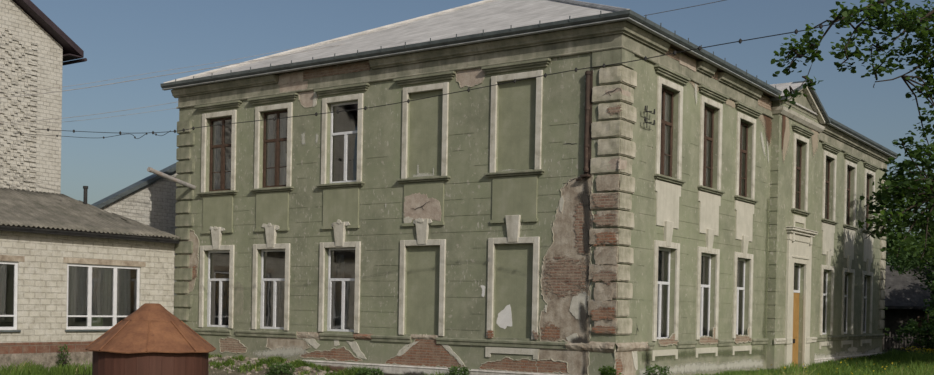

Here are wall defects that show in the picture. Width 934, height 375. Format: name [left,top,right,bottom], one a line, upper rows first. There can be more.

flaking render [404,192,442,224]
flaking render [479,157,627,375]
flaking render [266,337,367,362]
flaking render [385,334,466,368]